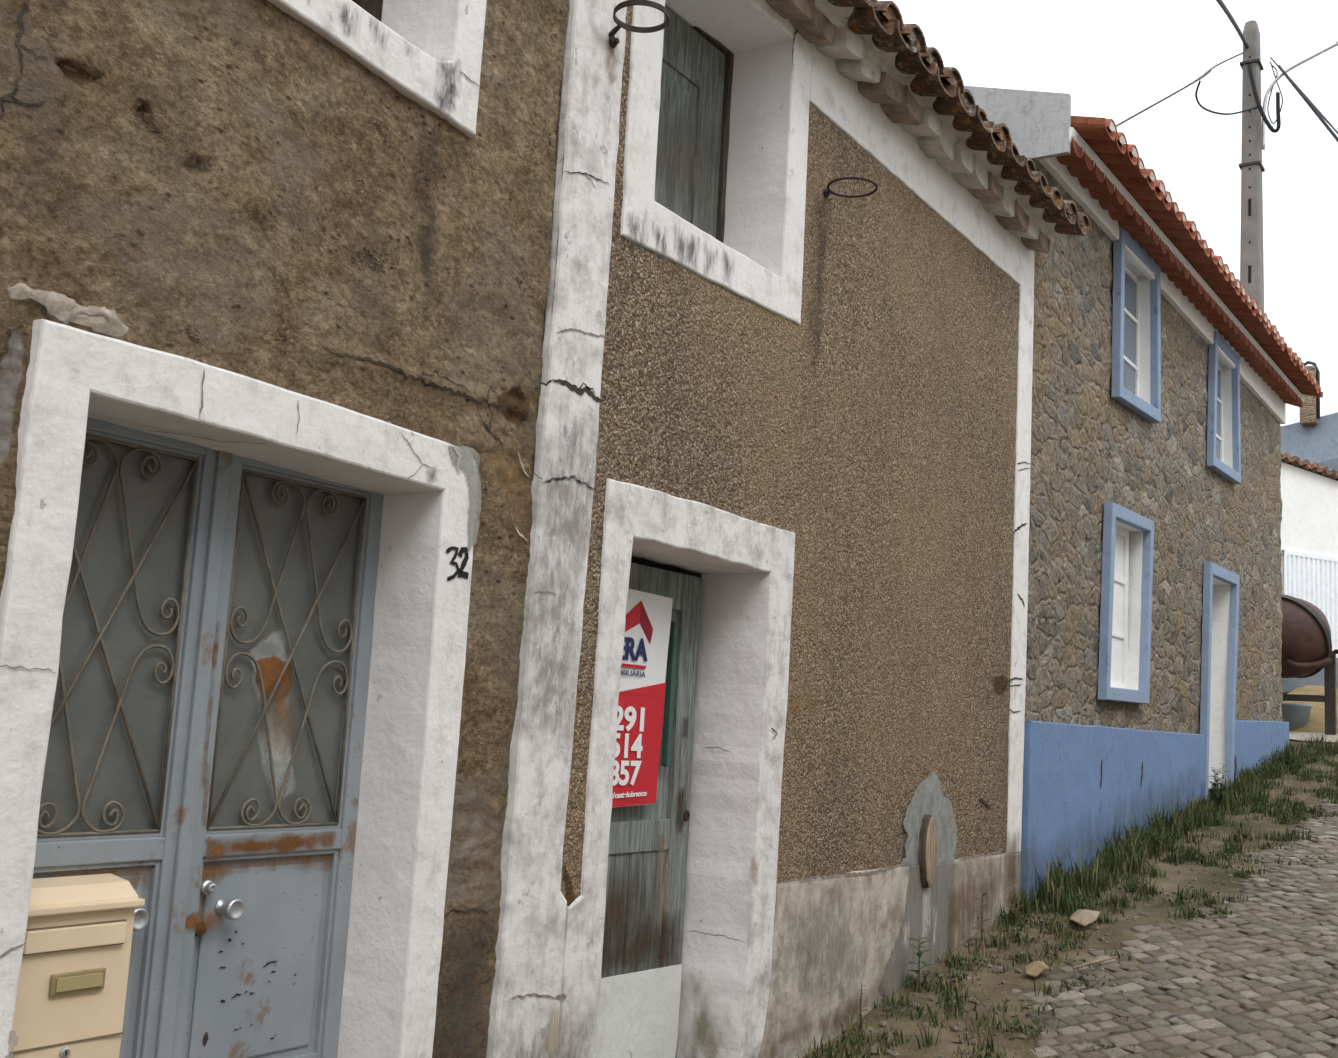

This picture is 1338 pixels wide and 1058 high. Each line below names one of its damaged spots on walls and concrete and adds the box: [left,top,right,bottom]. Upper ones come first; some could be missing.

water stain [440,65,455,108]
crack [563,171,610,189]
water stain [631,219,730,270]
peeling [8,283,129,337]
peeling [0,330,22,463]
crack [322,345,605,492]
peeling [448,445,529,551]
corrosion [256,657,292,734]
corrosion [202,834,333,879]
spalling [564,866,575,907]
corrosion [185,914,220,929]
crack [512,992,567,1000]